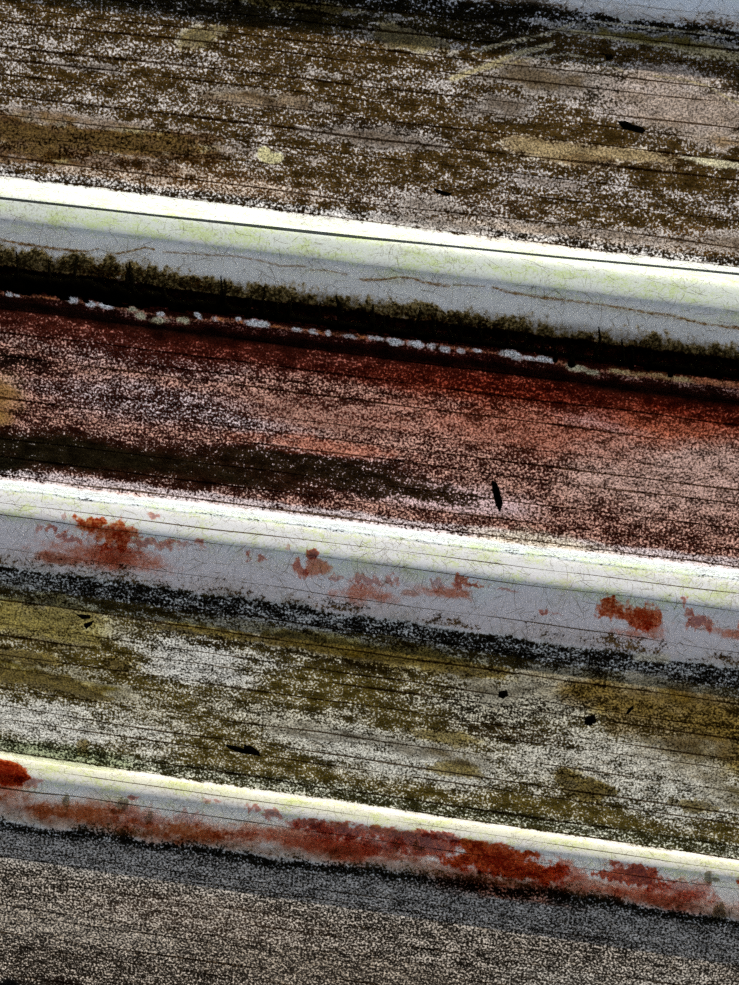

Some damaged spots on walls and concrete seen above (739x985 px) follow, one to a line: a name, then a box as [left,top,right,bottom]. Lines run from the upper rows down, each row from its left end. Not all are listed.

leakage [58,154,195,179]
corrosion [37,514,206,571]
corrosion [292,548,339,581]
corrosion [347,572,394,602]
corrosion [404,572,484,597]
corrosion [594,595,663,639]
corrosion [681,597,739,638]
corrosion [0,758,726,925]